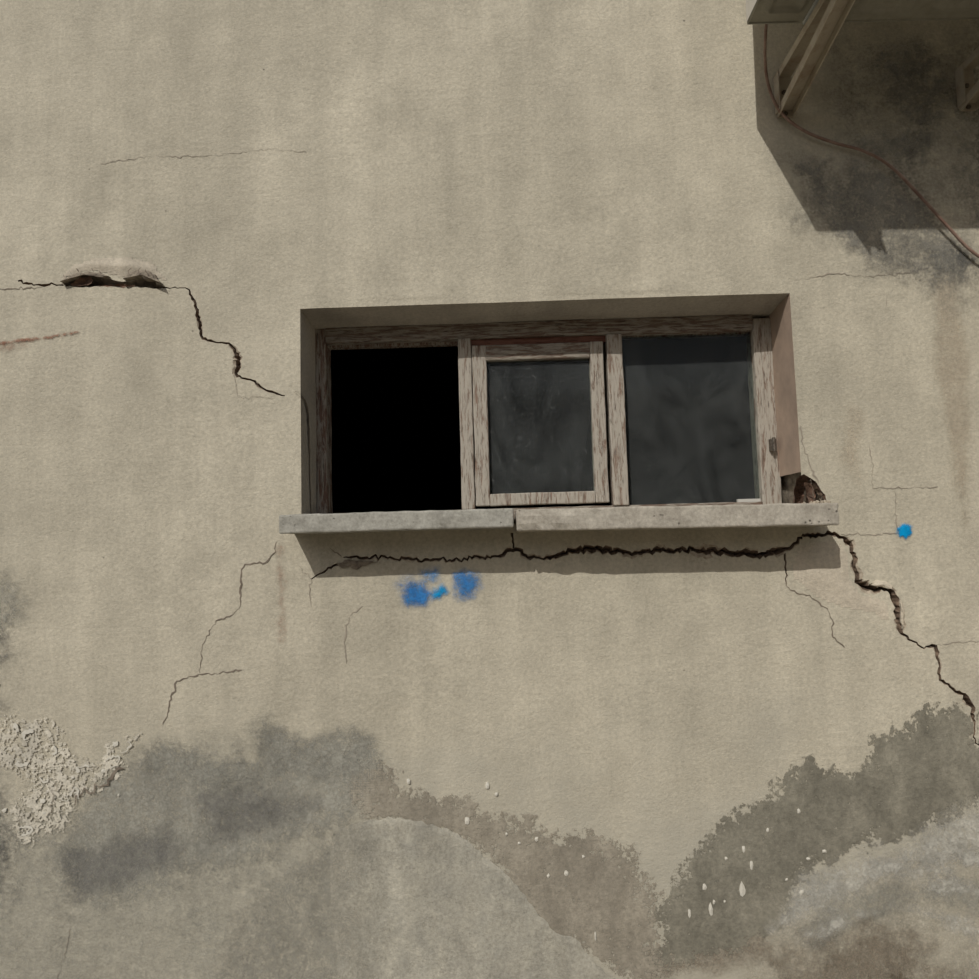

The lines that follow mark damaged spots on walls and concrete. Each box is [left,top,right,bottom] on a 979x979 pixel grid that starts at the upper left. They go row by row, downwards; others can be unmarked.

crack [2,279,64,290]
water stain [798,164,976,280]
crack [161,287,312,514]
crack [162,543,276,725]
crack [300,446,979,745]
water stain [46,701,979,979]